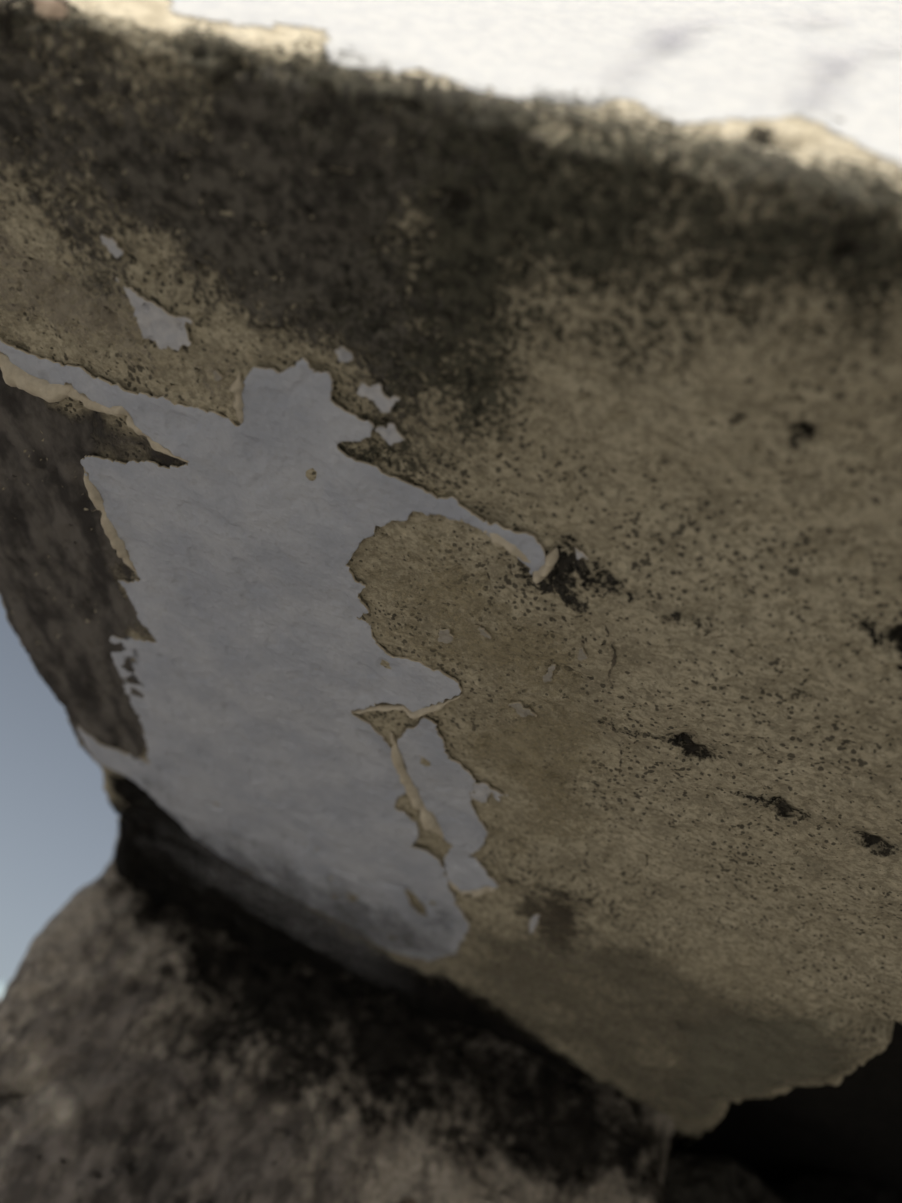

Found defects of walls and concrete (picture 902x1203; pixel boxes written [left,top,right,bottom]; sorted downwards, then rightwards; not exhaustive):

peeling [100,234,125,258]
peeling [116,277,194,351]
damp [0,0,902,476]
damp [0,369,187,762]
peeling [0,338,559,961]
damp [519,535,648,615]
damp [670,612,719,636]
damp [101,770,695,1203]